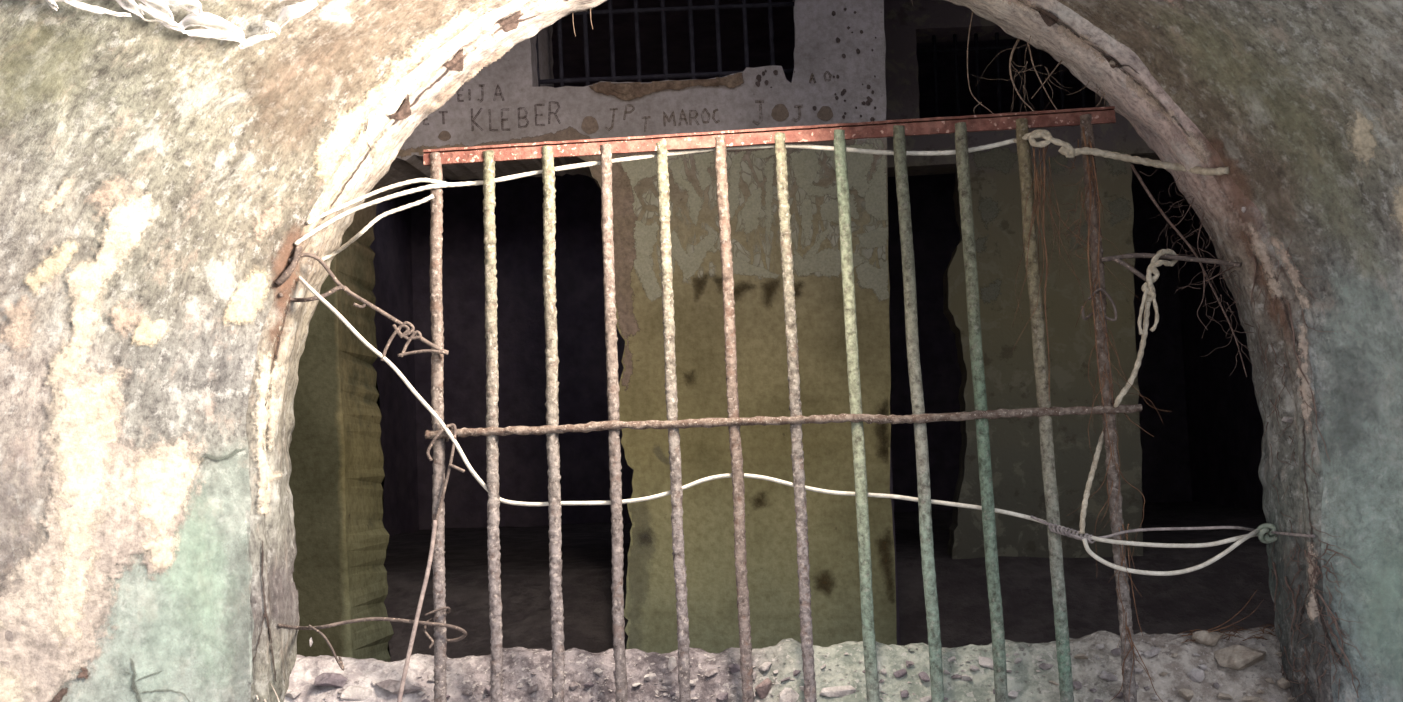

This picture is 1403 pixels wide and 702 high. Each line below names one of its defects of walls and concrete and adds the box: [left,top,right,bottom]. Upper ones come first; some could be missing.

flaking render [224,271,269,324]
flaking render [255,204,283,241]
peeling [314,1,889,391]
flaking render [0,176,206,702]
flaking render [252,355,281,514]